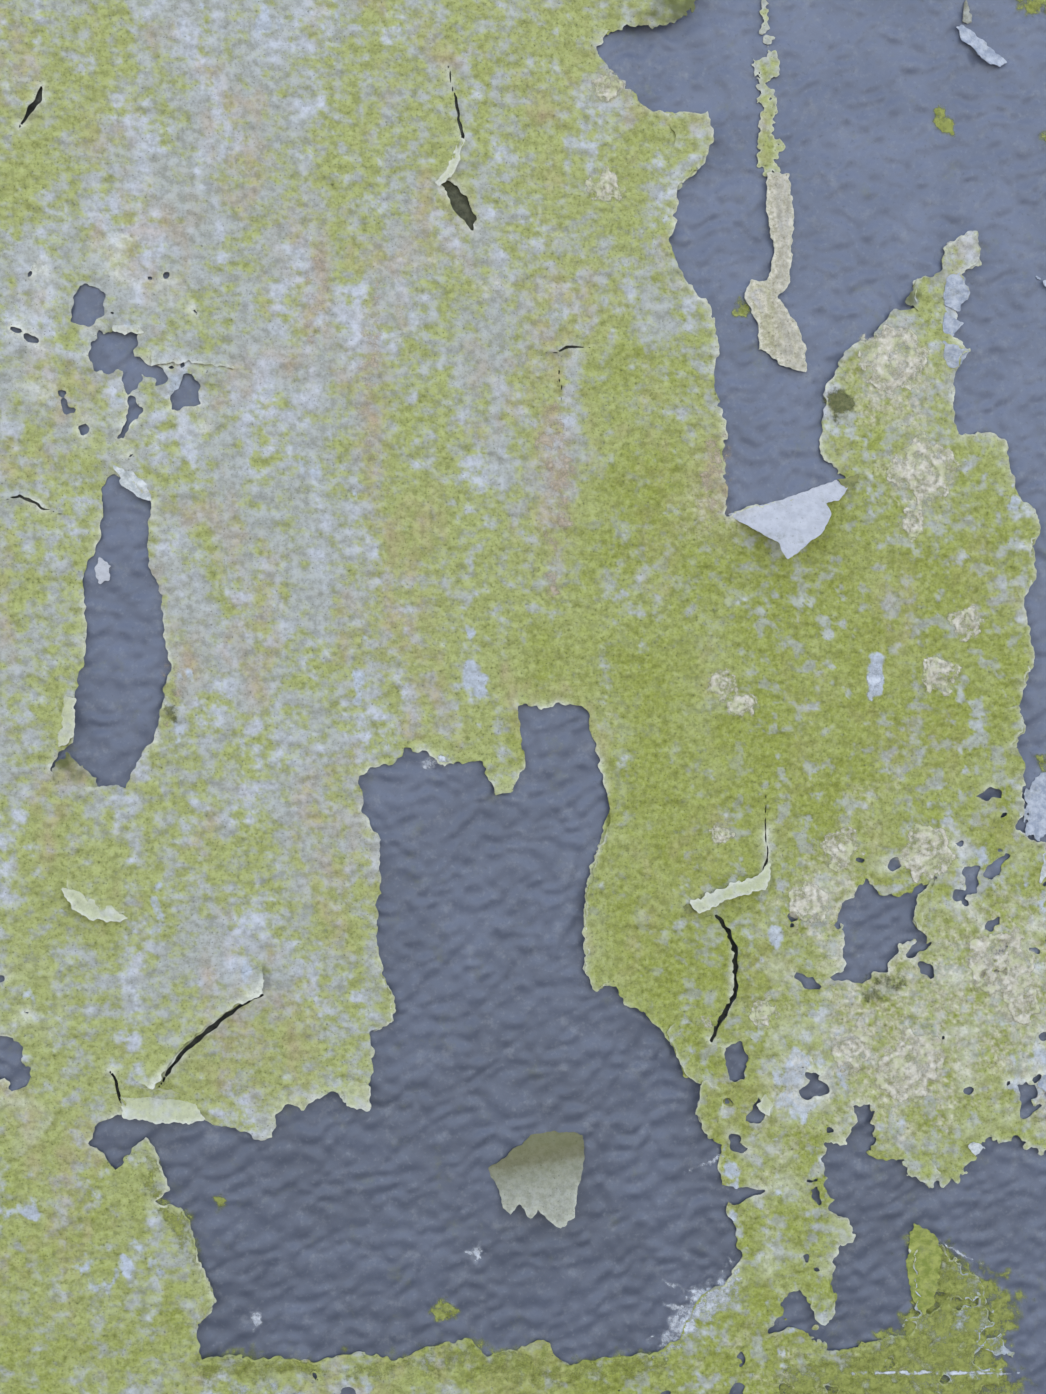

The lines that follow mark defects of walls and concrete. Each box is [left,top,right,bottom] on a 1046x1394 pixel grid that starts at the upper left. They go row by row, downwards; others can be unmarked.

peeling [599,0,696,35]
peeling [956,0,1007,67]
crack [435,66,477,231]
peeling [744,0,807,372]
peeling [71,284,234,439]
peeling [728,474,860,559]
peeling [50,465,172,788]
peeling [1023,772,1046,883]
crack [683,795,771,1042]
peeling [837,876,937,981]
peeling [0,1036,31,1091]
peeling [88,702,773,1365]